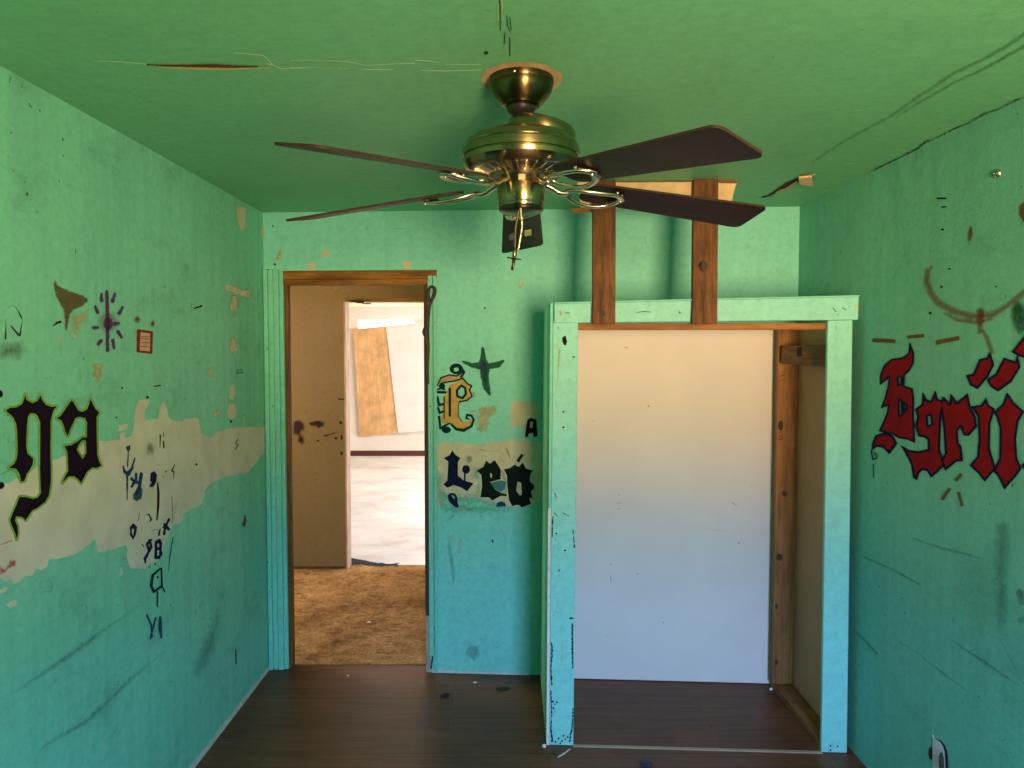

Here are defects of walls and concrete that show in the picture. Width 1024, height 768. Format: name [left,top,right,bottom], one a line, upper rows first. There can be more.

crack [102,53,481,71]
peeling [237,207,245,231]
peeling [510,401,539,427]
peeling [437,406,542,512]
peeling [0,385,265,608]